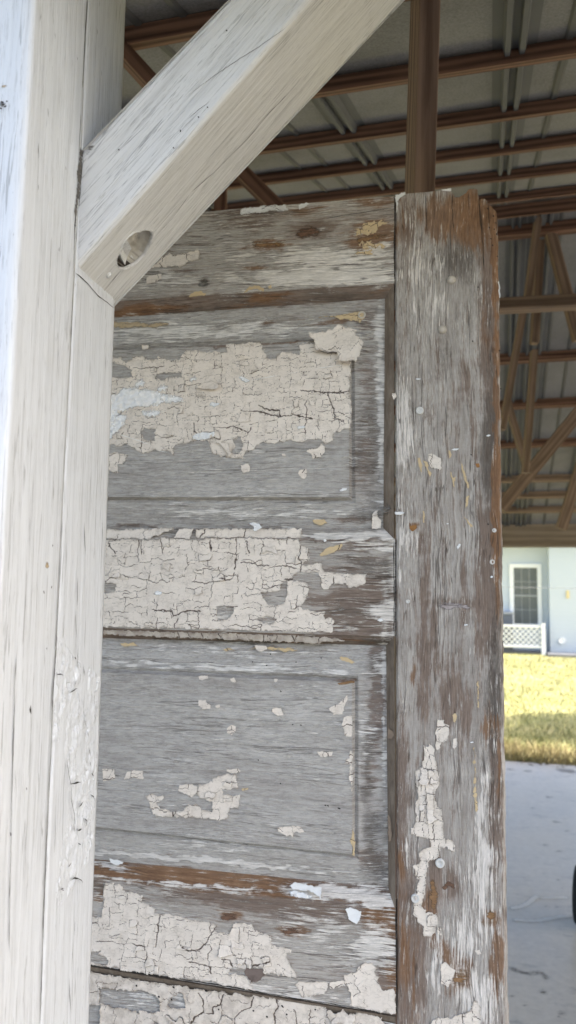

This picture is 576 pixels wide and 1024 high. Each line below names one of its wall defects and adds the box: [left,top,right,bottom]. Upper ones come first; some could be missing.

crack [327,202,395,280]
peeling [109,312,365,479]
peeling [103,527,366,652]
crack [390,546,398,633]
peeling [146,768,248,821]
peeling [411,713,457,937]
crack [69,913,397,1015]
peeling [89,882,396,1024]